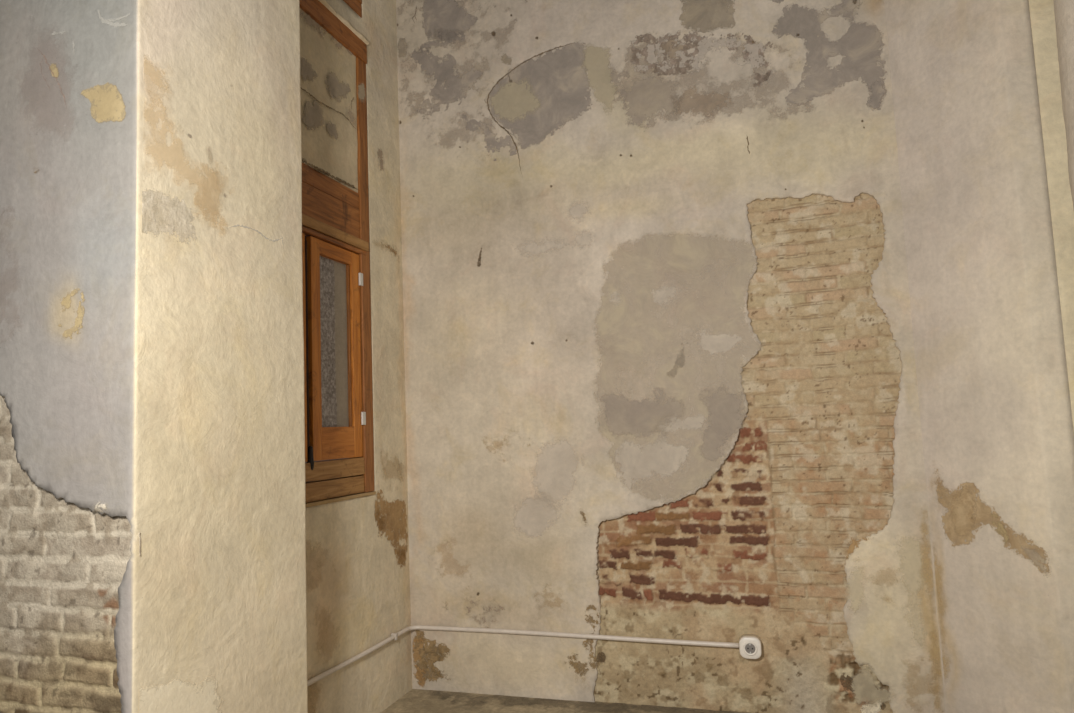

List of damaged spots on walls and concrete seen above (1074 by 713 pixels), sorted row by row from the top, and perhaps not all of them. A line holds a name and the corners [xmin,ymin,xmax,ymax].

peeling [81,82,126,123]
crack [487,42,575,171]
peeling [398,0,887,161]
flaking render [594,193,902,713]
flaking render [0,395,141,713]